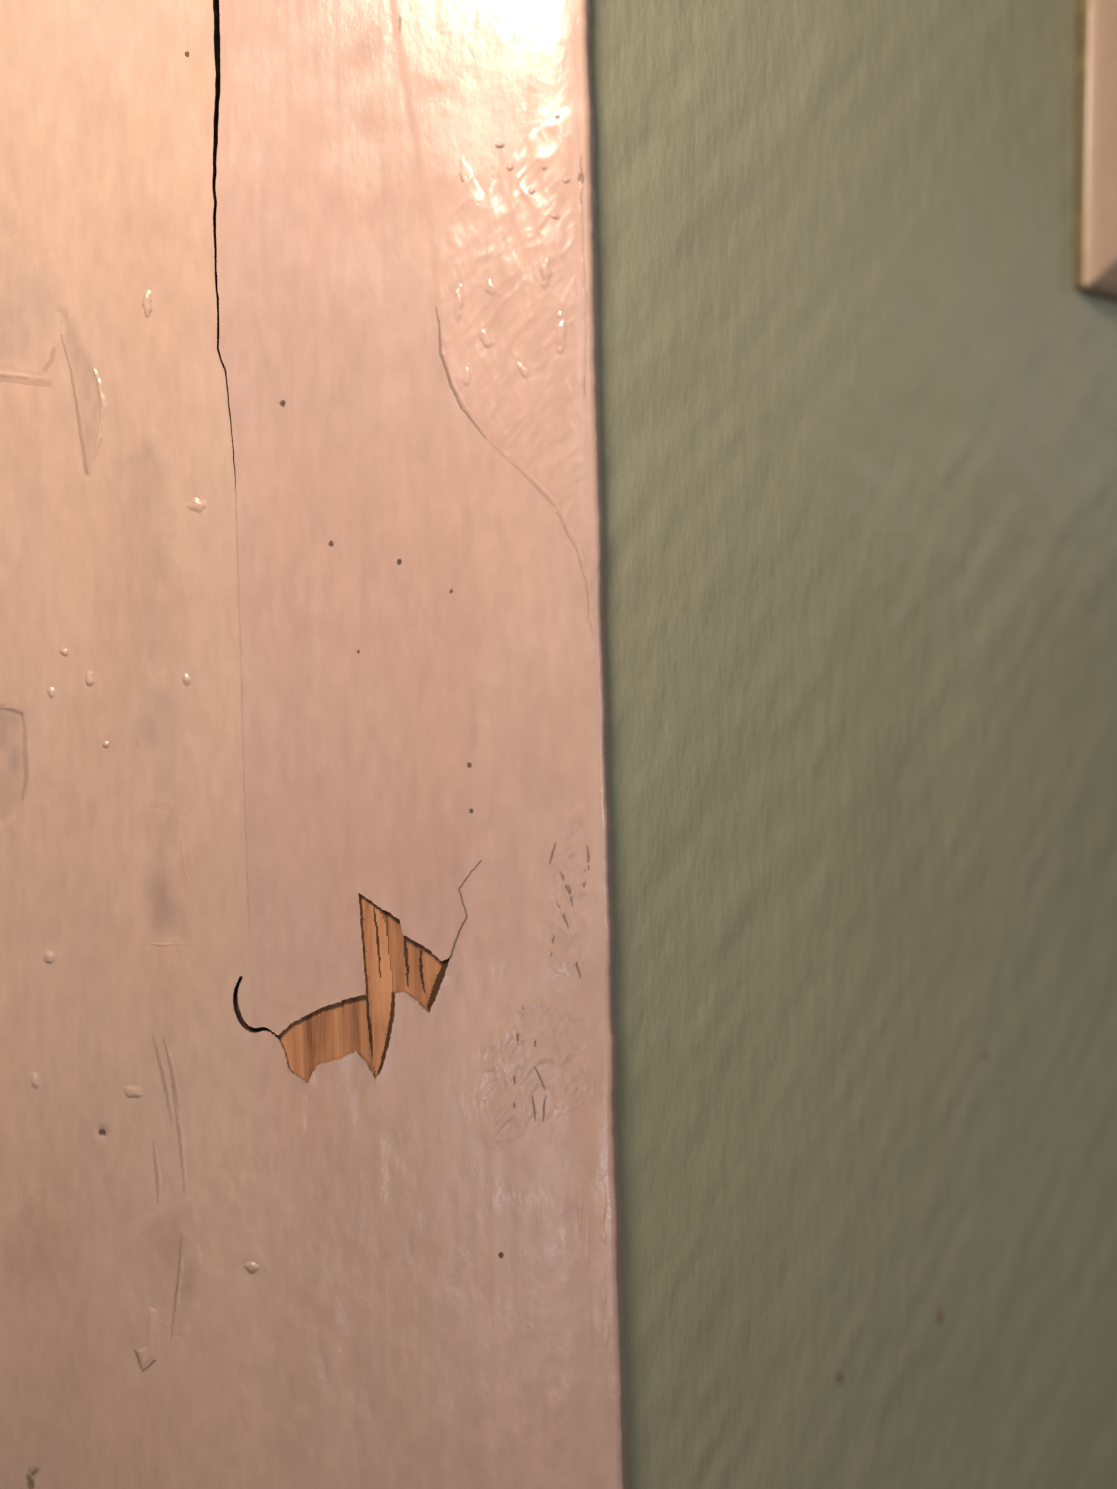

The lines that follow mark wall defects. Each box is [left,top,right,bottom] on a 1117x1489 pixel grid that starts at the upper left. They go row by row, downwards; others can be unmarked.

crack [212,0,236,488]
peeling [233,893,450,1083]
crack [450,860,482,958]